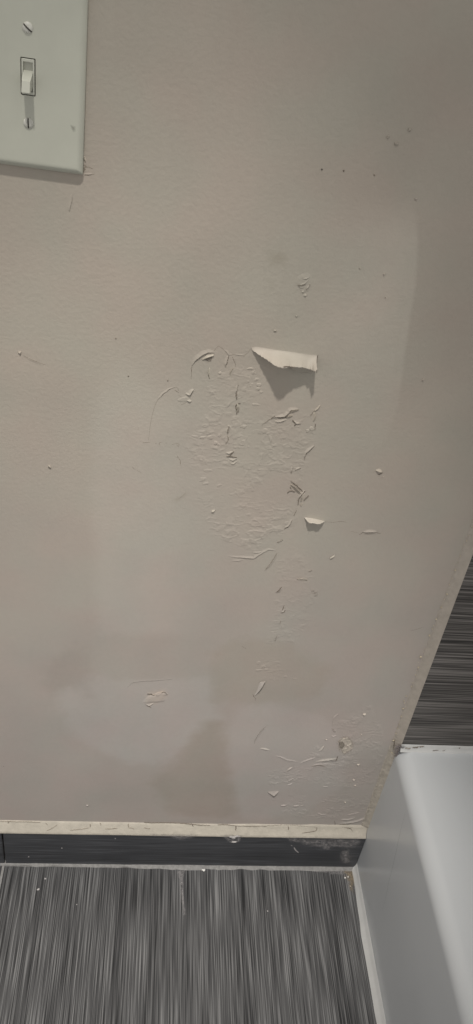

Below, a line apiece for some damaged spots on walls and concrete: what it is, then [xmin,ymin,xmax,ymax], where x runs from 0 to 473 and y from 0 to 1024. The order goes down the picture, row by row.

peeling [251,347,318,373]
peeling [287,481,344,524]